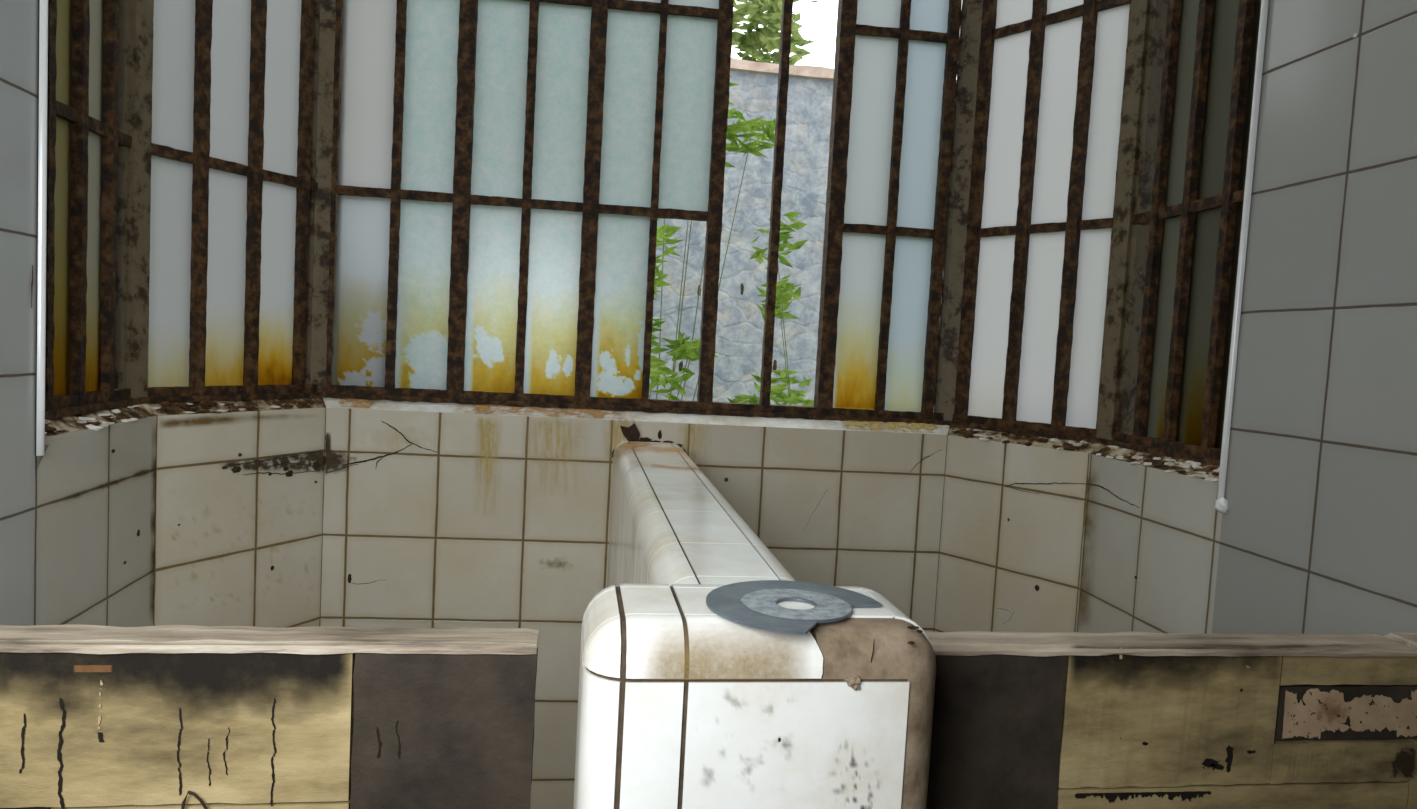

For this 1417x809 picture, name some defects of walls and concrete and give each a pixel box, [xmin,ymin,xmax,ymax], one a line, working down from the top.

spalling [37,399,315,468]
crack [344,421,437,469]
spalling [952,426,1220,482]
leakage [0,652,346,809]
peeling [1282,688,1417,777]